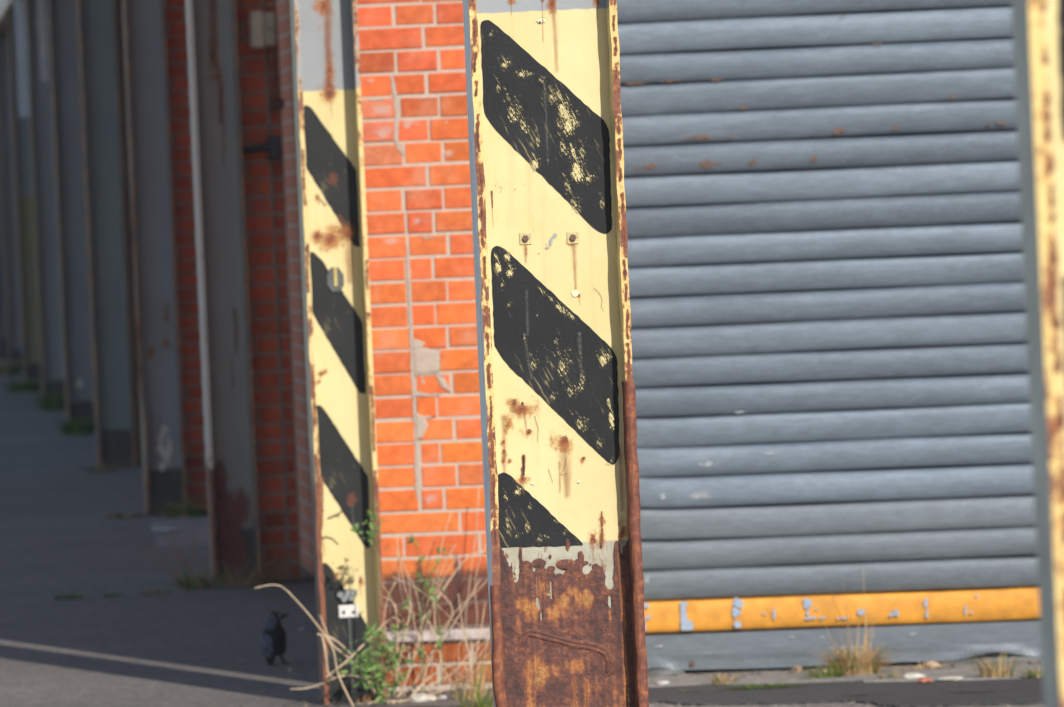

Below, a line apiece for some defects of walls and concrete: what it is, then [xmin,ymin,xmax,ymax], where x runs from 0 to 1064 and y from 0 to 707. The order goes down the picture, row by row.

rust [314,0,335,101]
rust [475,114,493,279]
peeling [496,55,594,214]
rust [1043,89,1056,224]
rust [305,226,354,293]
peeling [494,250,516,291]
spalling [412,339,451,397]
rust [484,259,649,707]
rust [314,454,338,703]
peeling [680,600,696,631]
peeling [732,596,744,628]
peeling [803,598,866,620]